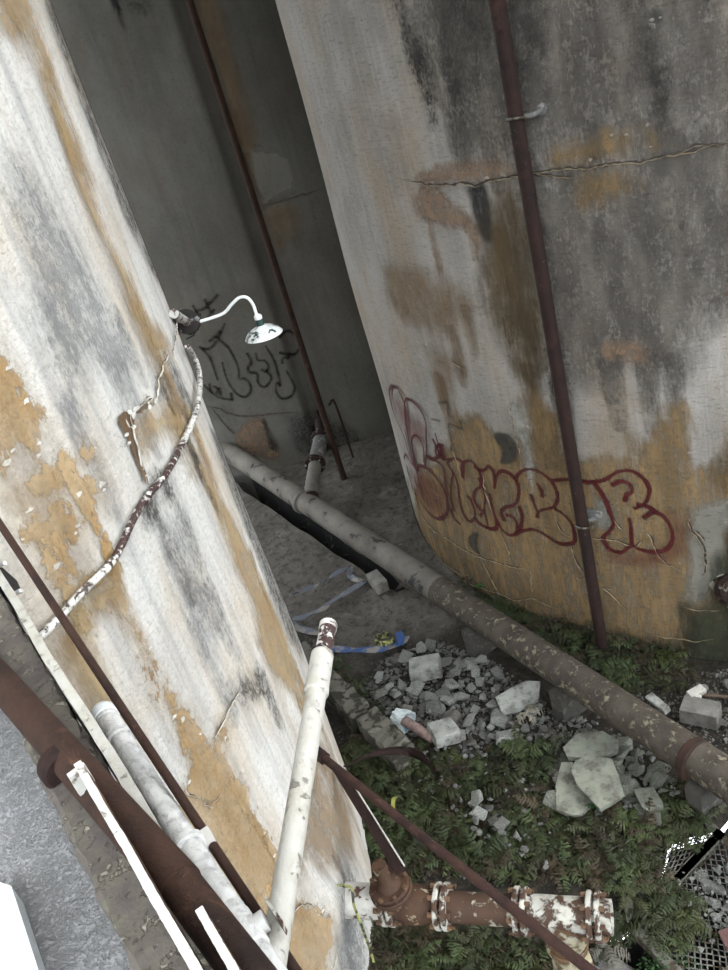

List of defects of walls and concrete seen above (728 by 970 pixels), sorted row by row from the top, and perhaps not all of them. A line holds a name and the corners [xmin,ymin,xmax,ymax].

water stain [395,0,545,395]
crack [397,142,728,188]
water stain [506,0,728,407]
crack [126,321,181,487]
peeling [0,356,122,637]
crack [409,441,578,621]
peeling [412,391,728,651]
crack [556,511,708,611]
water stain [608,499,728,662]
crack [654,634,713,642]
peeling [135,633,278,914]